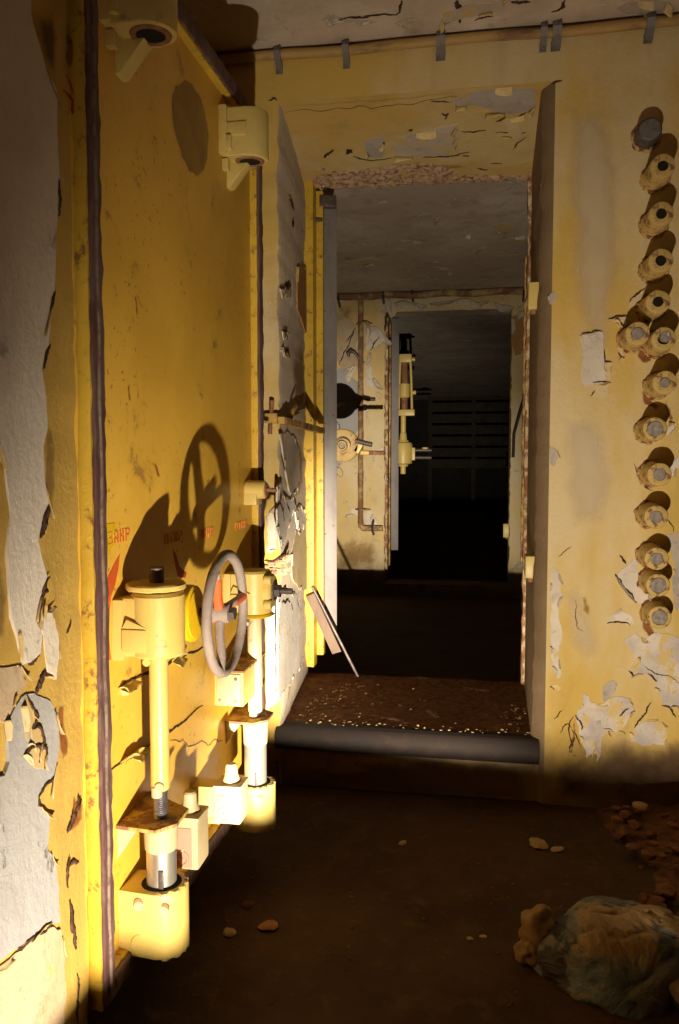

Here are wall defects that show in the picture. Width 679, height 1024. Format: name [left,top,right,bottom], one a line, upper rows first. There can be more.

crack [339,0,403,21]
crack [268,96,527,170]
spalling [311,86,536,190]
peeling [337,313,392,434]
peeling [580,330,624,398]
peeling [0,0,68,1024]
peeling [265,430,307,710]
peeling [550,567,563,691]
peeling [572,556,679,761]
peeling [666,532,679,610]